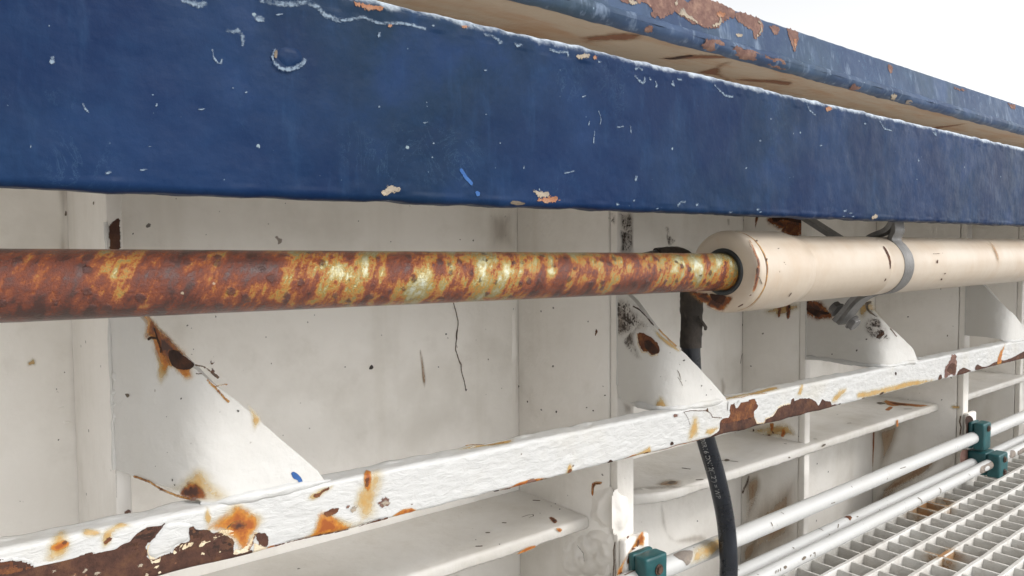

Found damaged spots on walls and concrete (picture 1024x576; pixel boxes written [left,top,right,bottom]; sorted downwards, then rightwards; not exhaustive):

peeling [511,191,560,205]
rust [109,218,121,249]
rust [691,217,801,311]
rust [145,316,194,378]
crack [453,303,467,391]
rust [636,329,677,357]
peeling [84,509,131,545]
rust [0,470,415,576]